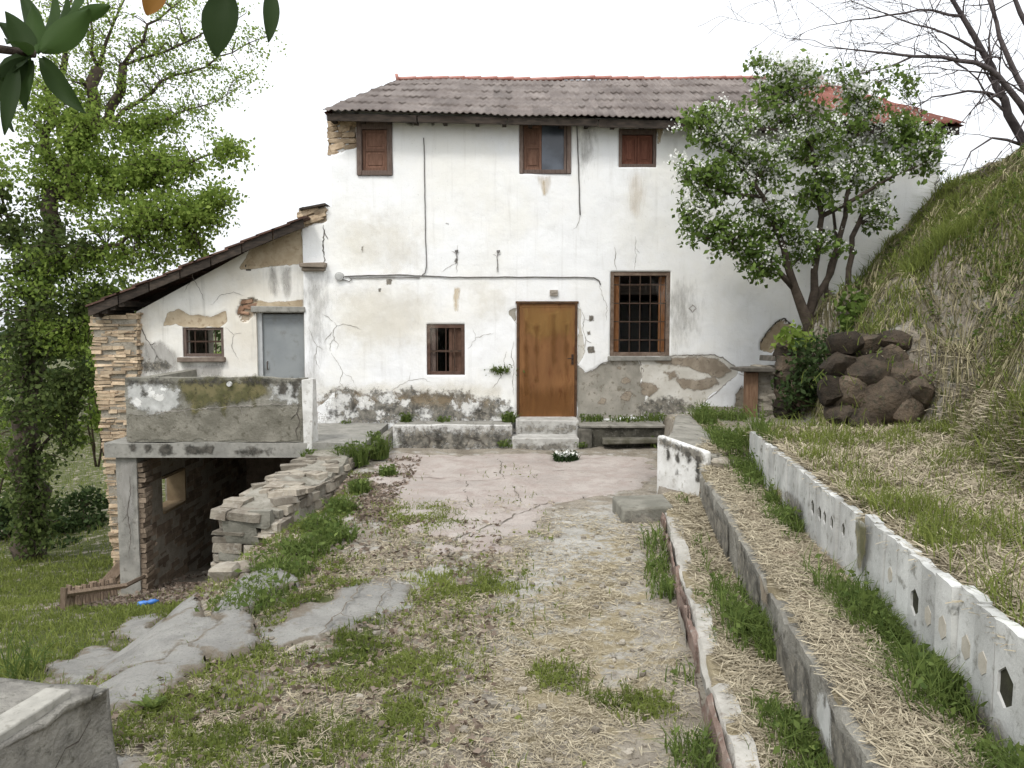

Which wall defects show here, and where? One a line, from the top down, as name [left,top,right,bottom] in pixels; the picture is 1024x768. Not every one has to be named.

spalling [327,121,357,156]
spalling [240,207,328,271]
spalling [164,298,303,328]
leakage [128,342,301,399]
crack [311,315,361,389]
spalling [577,308,743,420]
leakage [317,385,578,450]